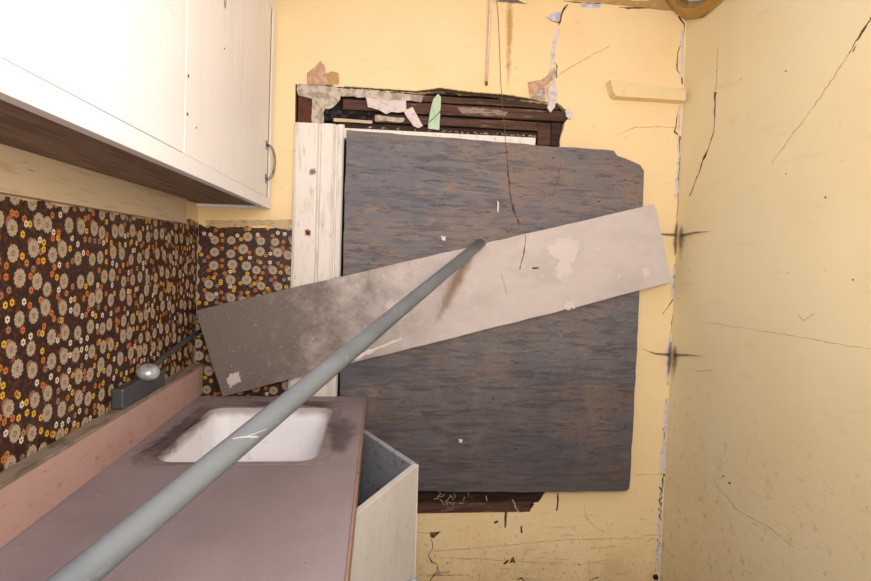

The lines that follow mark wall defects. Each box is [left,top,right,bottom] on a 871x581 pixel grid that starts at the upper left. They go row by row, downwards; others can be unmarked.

spalling [297,61,573,146]
crack [497,0,526,8]
crack [546,1,685,84]
crack [617,48,718,210]
crack [772,17,871,162]
crack [417,250,676,581]